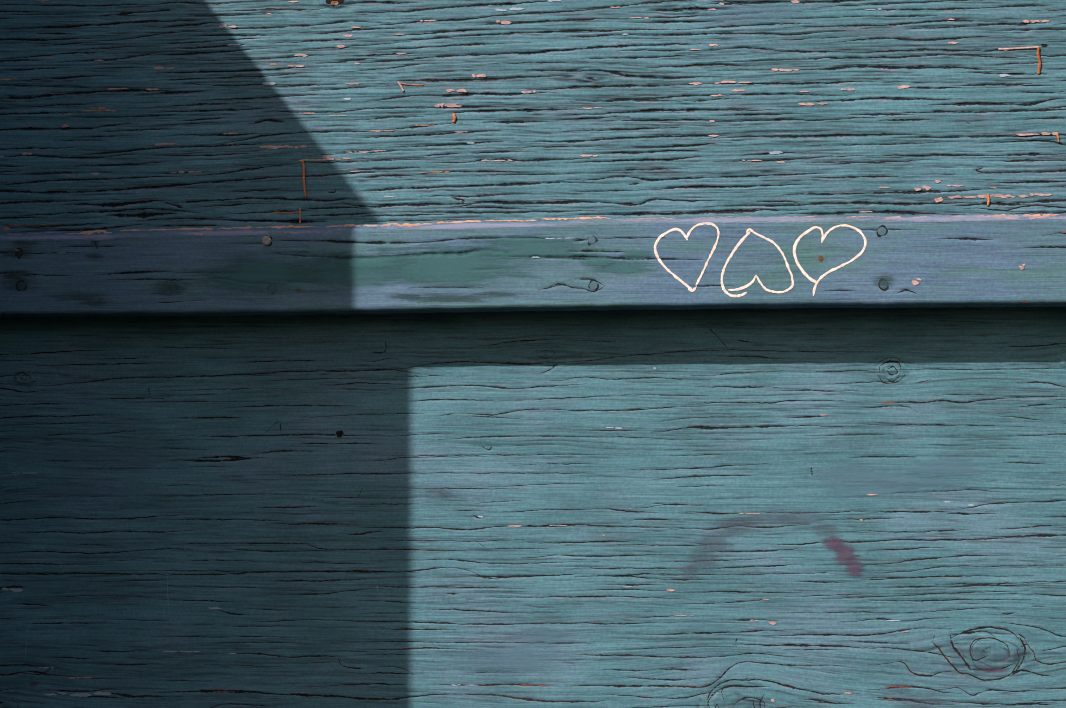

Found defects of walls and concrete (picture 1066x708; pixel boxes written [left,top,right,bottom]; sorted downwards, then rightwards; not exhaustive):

peeling [434,89,467,108]
peeling [689,81,751,96]
peeling [914,180,1052,202]
peeling [3,211,313,235]
peeling [327,216,611,227]
crack [94,271,222,303]
crack [0,327,1066,708]
water stain [826,536,864,577]